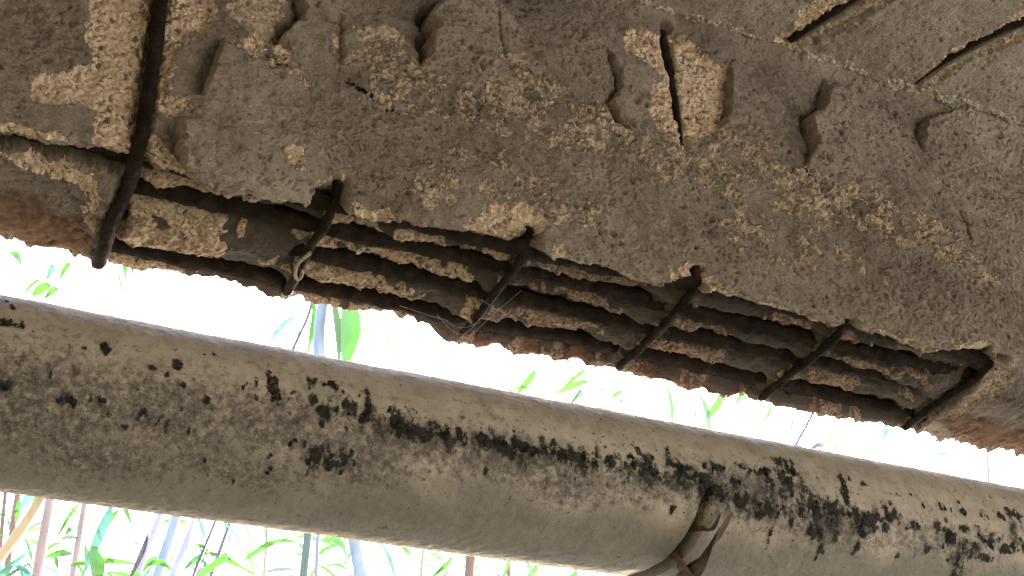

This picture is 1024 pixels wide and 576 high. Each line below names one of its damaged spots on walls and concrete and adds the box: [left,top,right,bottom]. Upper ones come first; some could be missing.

spalling [0,0,150,233]
spalling [108,0,1003,319]
rust [0,190,93,253]
damp [0,300,25,329]
damp [149,359,186,389]
rust [520,337,591,367]
spalling [453,295,732,389]
rust [620,359,749,399]
rust [775,397,819,415]
spalling [756,301,994,424]
damp [242,370,925,561]
damp [914,500,1024,576]